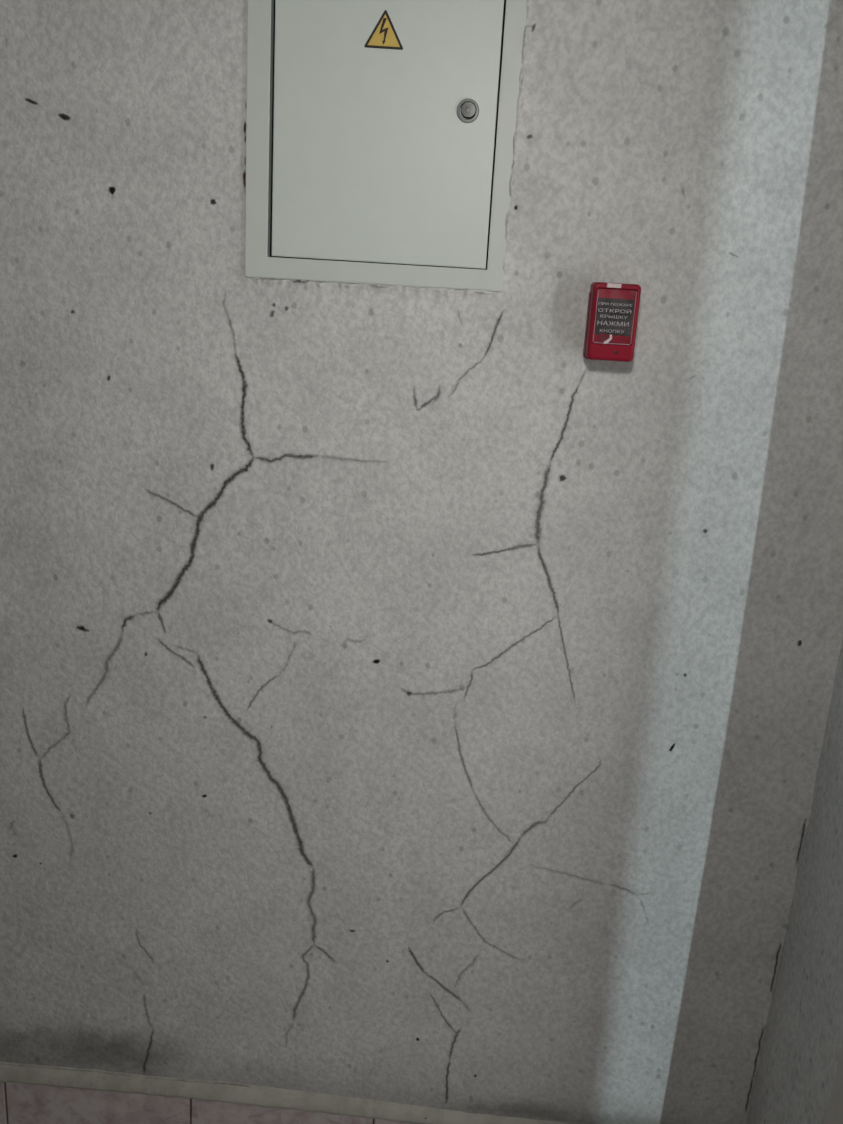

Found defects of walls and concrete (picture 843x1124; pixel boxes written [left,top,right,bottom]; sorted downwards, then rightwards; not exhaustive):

crack [122,357,313,629]
crack [477,388,578,668]
crack [23,712,57,807]
crack [198,658,331,958]
crack [463,841,519,902]
crack [445,1031,459,1101]